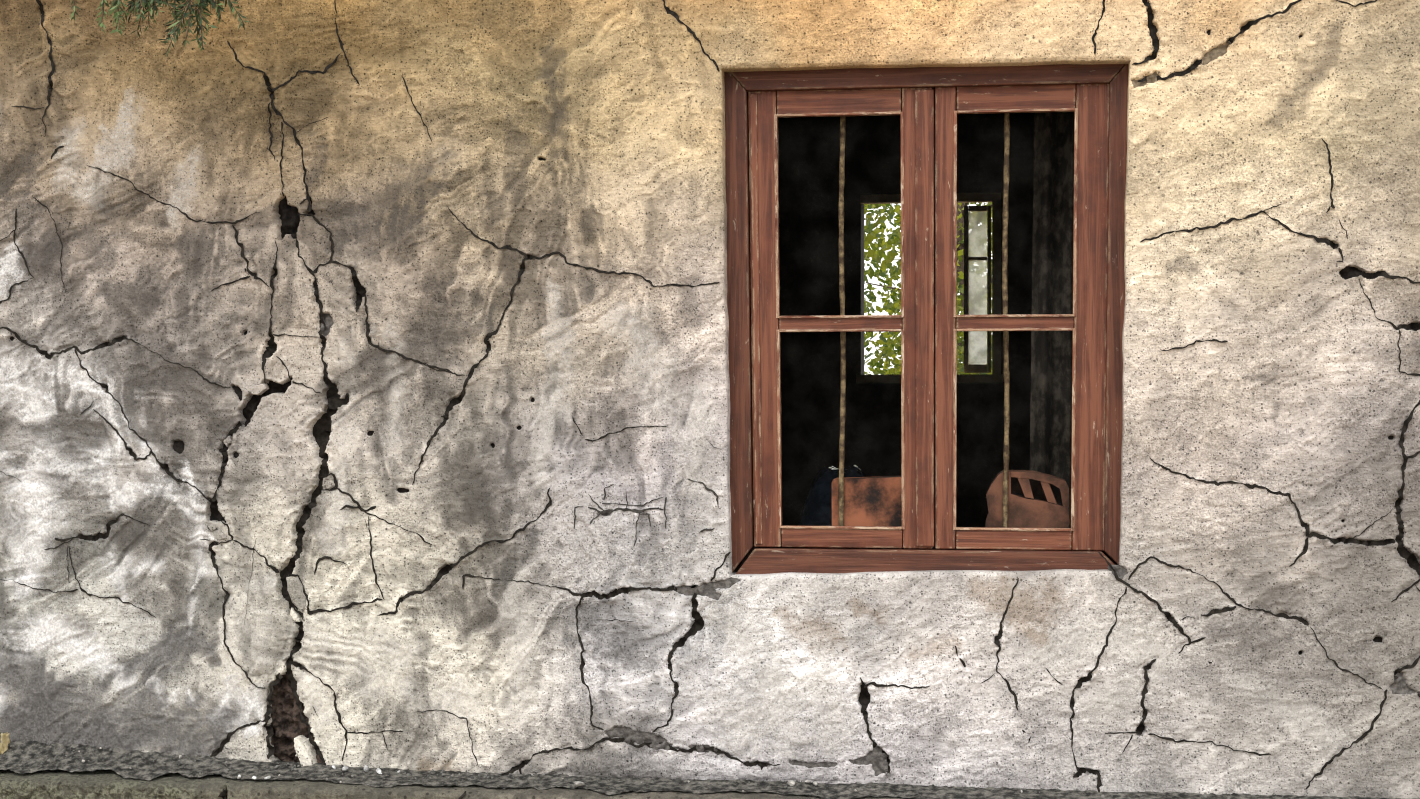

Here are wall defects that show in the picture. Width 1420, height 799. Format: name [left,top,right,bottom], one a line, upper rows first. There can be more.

crack [1092,0,1105,54]
crack [1131,0,1302,88]
crack [1336,0,1377,8]
crack [0,0,930,799]
crack [1140,138,1420,602]
crack [955,578,1031,743]
crack [1046,552,1420,792]